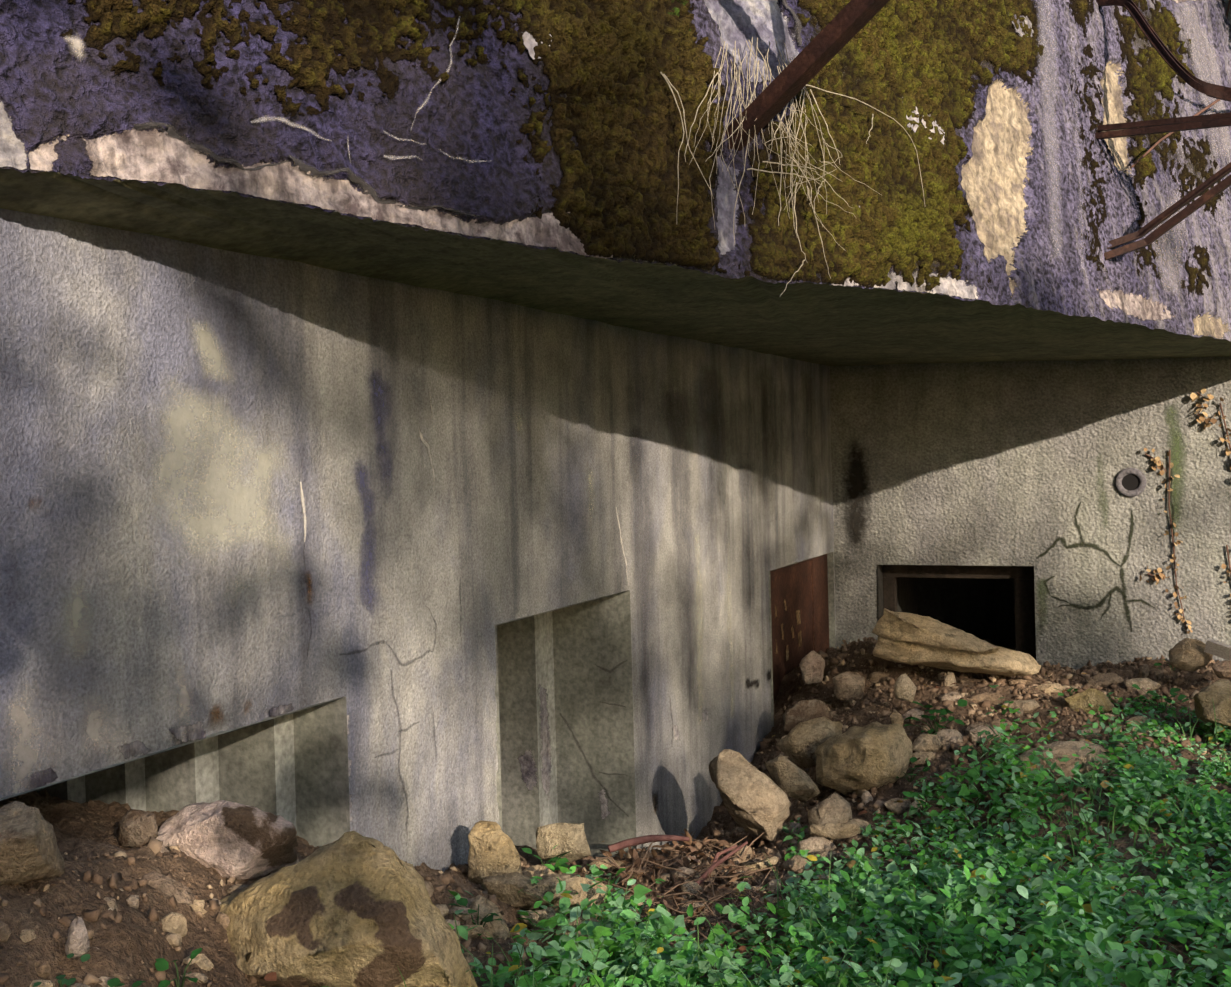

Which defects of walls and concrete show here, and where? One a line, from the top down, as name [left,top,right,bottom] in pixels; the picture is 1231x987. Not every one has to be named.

spalling [704,0,799,83]
spalling [0,101,613,258]
spalling [716,156,740,255]
spalling [961,79,1034,299]
spalling [1100,61,1131,177]
leakage [844,442,870,543]
crack [1036,502,1155,632]
crack [340,577,461,846]